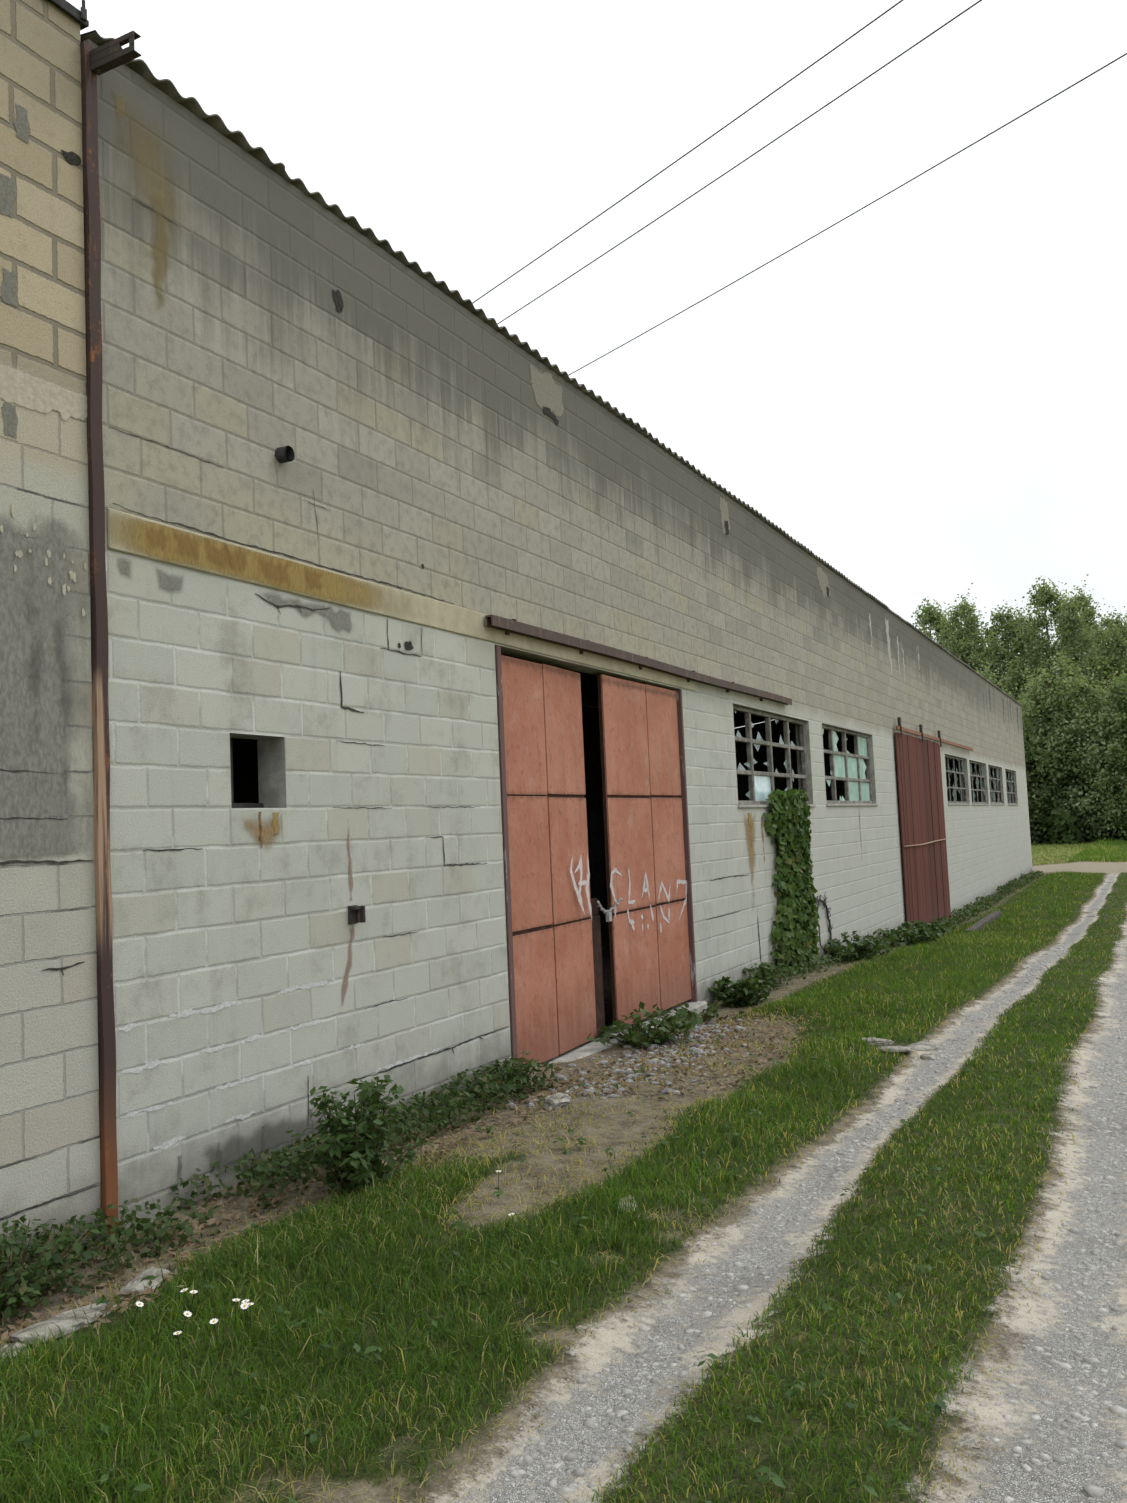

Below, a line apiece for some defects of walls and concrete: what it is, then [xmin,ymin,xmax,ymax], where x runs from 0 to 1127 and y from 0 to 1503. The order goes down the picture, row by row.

flaking render [0,363,87,421]
spalling [530,364,564,426]
rust [122,519,375,607]
spalling [267,594,351,631]
leakage [0,520,86,860]
rust [246,812,279,848]
rust [745,813,765,876]
rust [342,929,354,1001]